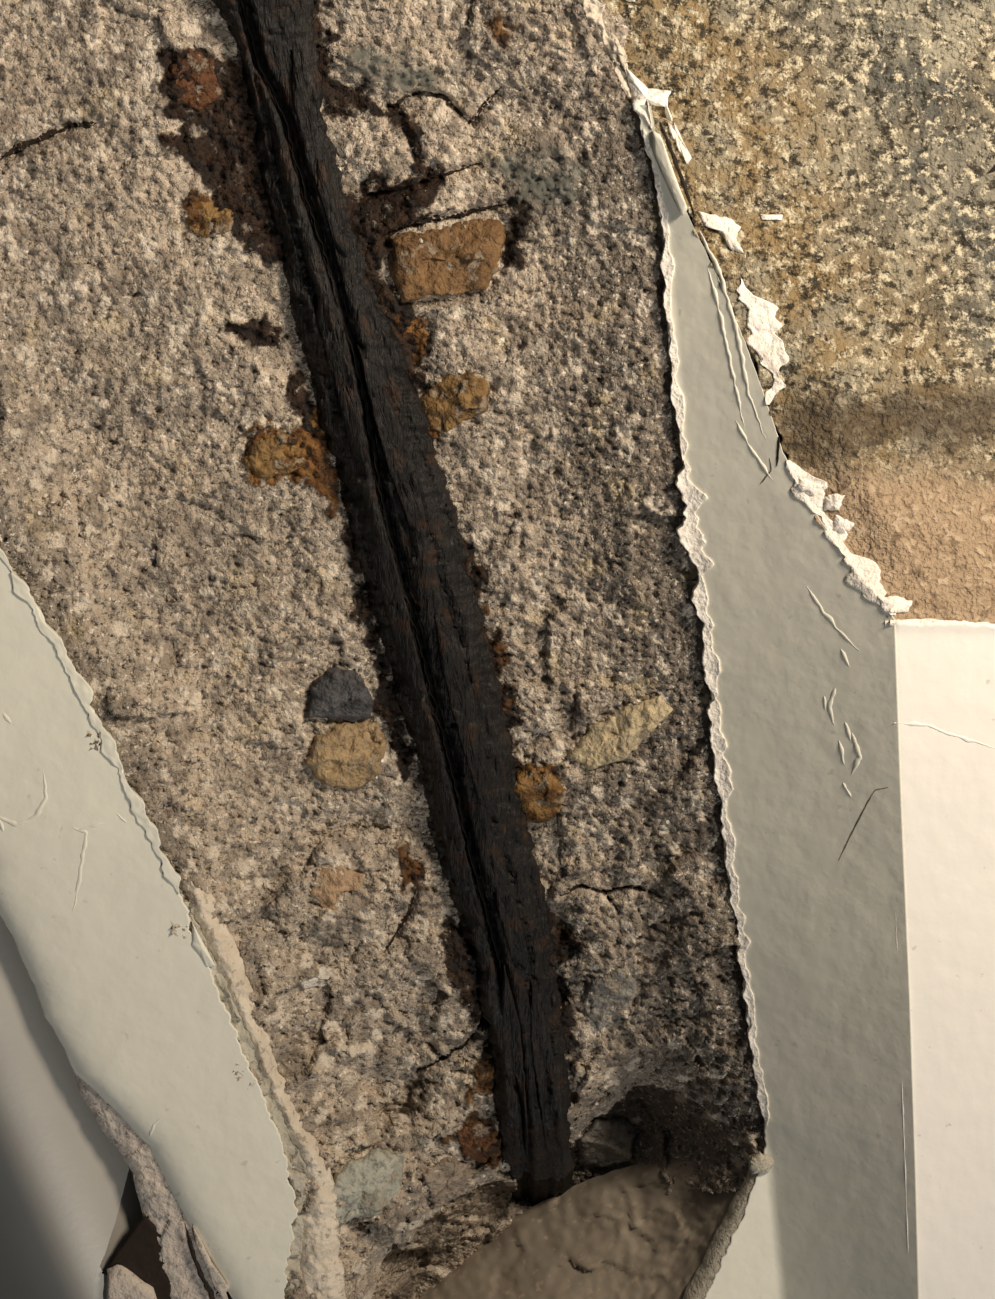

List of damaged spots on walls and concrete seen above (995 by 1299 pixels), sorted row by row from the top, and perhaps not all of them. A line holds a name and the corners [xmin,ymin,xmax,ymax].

crack [0,120,97,160]
rust [154,47,287,264]
rust [225,313,289,354]
rust [291,0,446,438]
rust [502,202,533,270]
peeling [736,279,789,405]
rust [242,370,430,783]
spalling [0,0,774,1299]
rust [457,527,565,781]
rust [396,844,430,894]
rust [432,766,503,1170]
rust [548,912,585,1072]